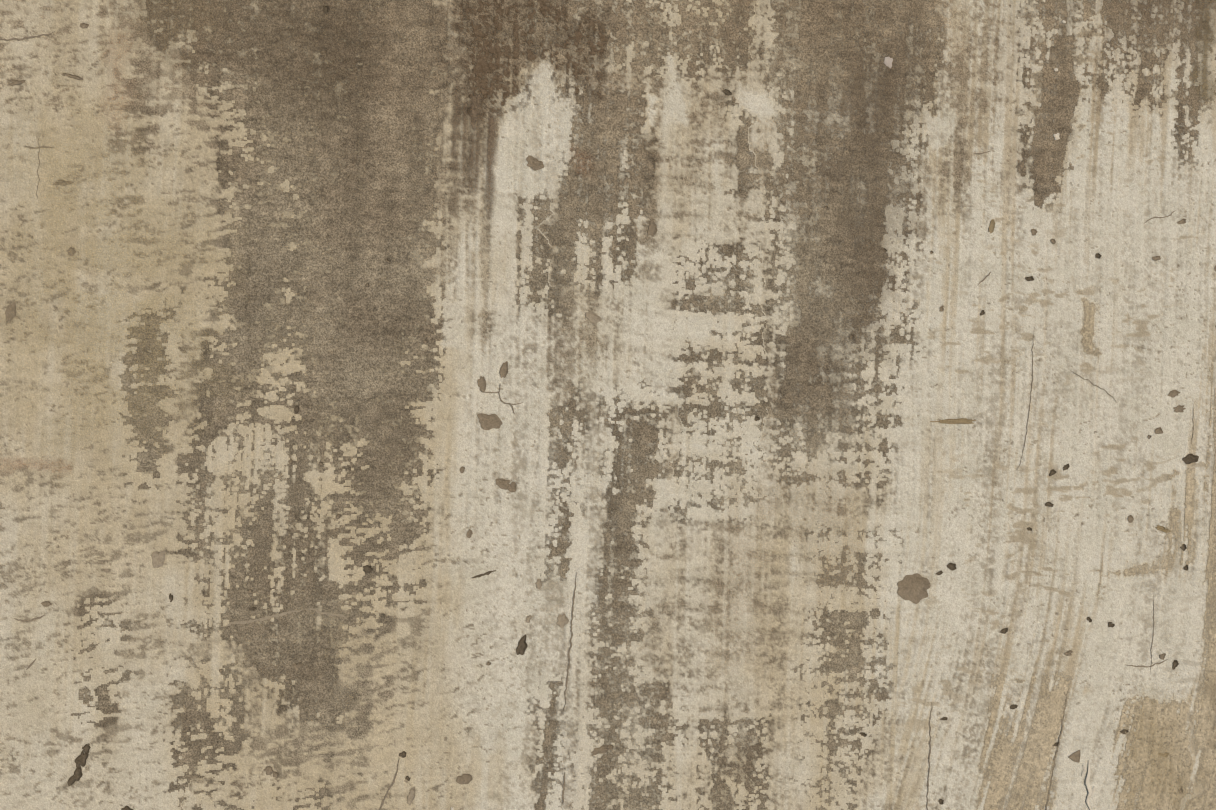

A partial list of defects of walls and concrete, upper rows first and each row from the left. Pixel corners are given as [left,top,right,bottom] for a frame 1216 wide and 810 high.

damp [1193,0,1213,100]